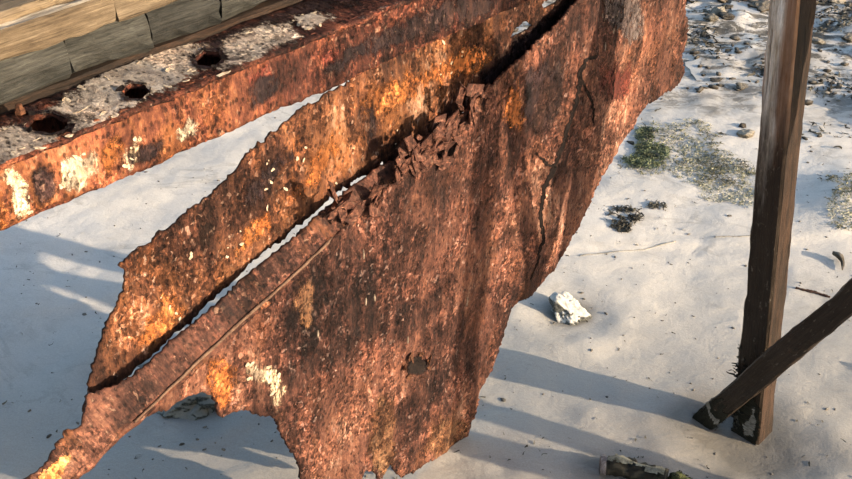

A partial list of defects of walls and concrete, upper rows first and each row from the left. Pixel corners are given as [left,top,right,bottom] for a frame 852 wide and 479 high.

corrosion [181,0,362,60]
corrosion [360,0,575,185]
corrosion [31,162,57,206]
corrosion [99,136,164,174]
corrosion [245,147,299,206]
corrosion [294,128,384,226]
crack [530,55,615,280]
corrosion [235,213,271,255]
corrosion [139,295,185,345]
corrosion [295,280,314,328]
corrosion [204,359,237,409]
corrosion [38,455,71,479]